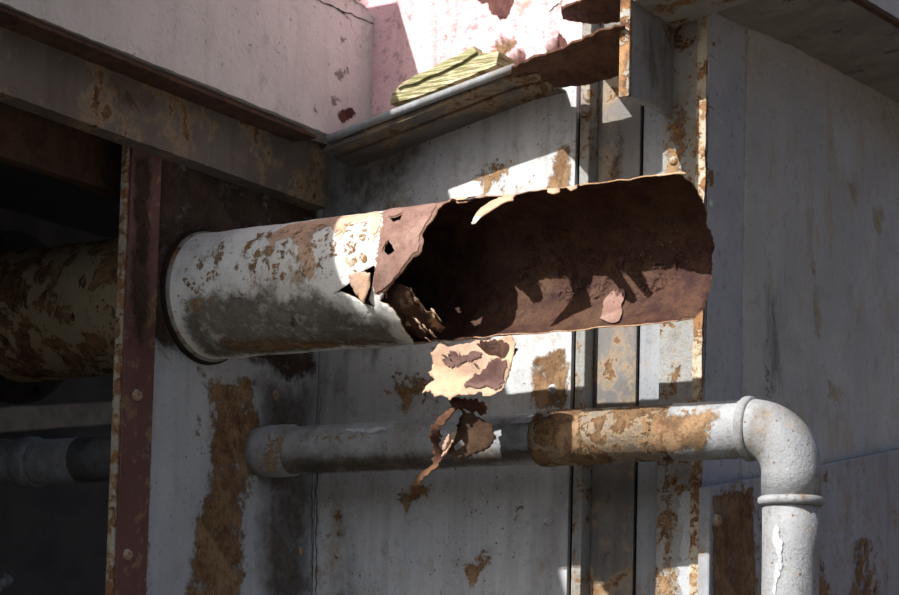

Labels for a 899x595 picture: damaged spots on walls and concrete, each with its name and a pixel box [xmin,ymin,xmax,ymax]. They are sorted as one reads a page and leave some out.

crack [318,0,375,29]
peeling [478,0,514,20]
corrosion [448,158,512,201]
corrosion [546,145,571,189]
corrosion [665,109,692,174]
corrosion [523,349,597,458]
corrosion [186,367,287,595]
corrosion [631,403,719,595]
corrosion [712,471,762,595]
corrosion [849,531,880,595]